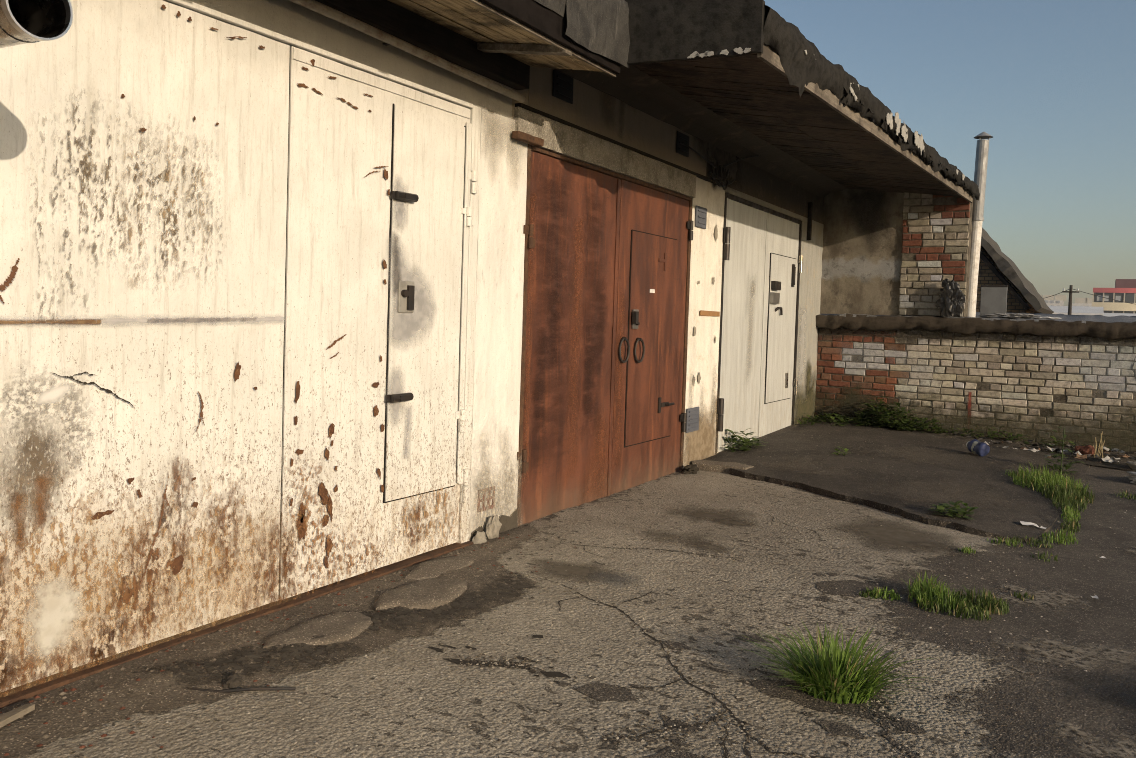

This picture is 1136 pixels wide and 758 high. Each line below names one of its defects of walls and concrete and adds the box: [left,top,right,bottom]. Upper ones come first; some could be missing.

leakage [393,182,432,340]
leakage [4,381,91,547]
crack [53,372,133,407]
rust [0,460,383,697]
rust [394,488,455,546]
crack [533,577,831,758]
crack [869,650,925,757]